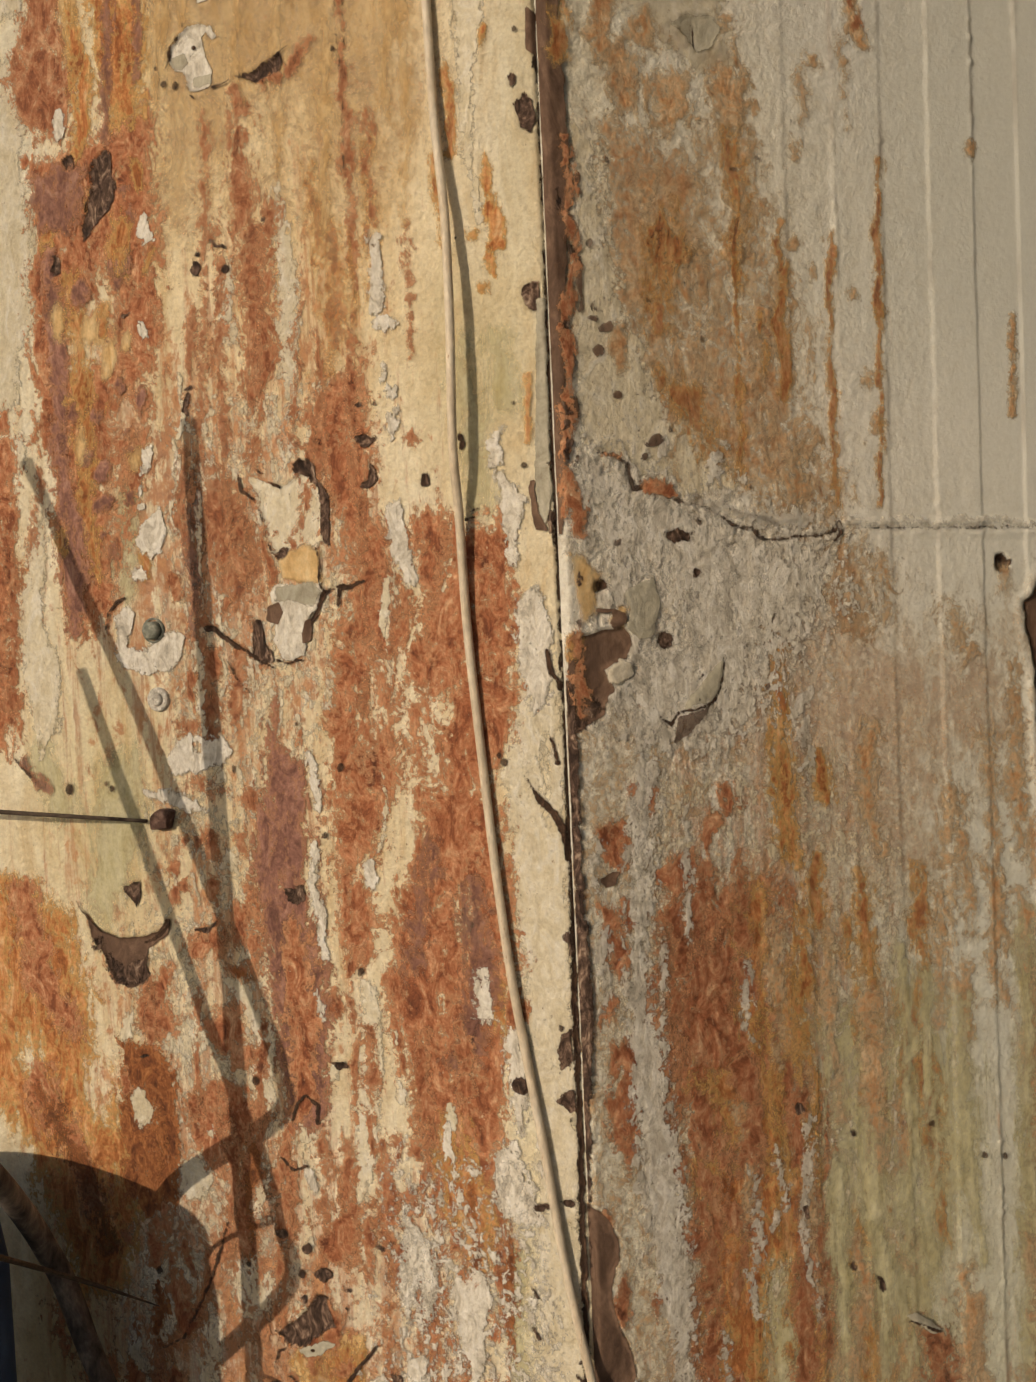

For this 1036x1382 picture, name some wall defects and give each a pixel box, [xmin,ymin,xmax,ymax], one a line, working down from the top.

peeling [154,23,334,107]
rust [579,0,898,643]
peeling [130,372,220,588]
rust [0,0,537,1382]
peeling [237,458,330,665]
spalling [511,539,635,733]
spalling [657,655,726,755]
crack [525,0,1029,1380]
spalling [1024,588,1036,687]
spalling [76,901,171,989]
peeling [224,977,320,1143]
spalling [198,1173,378,1382]